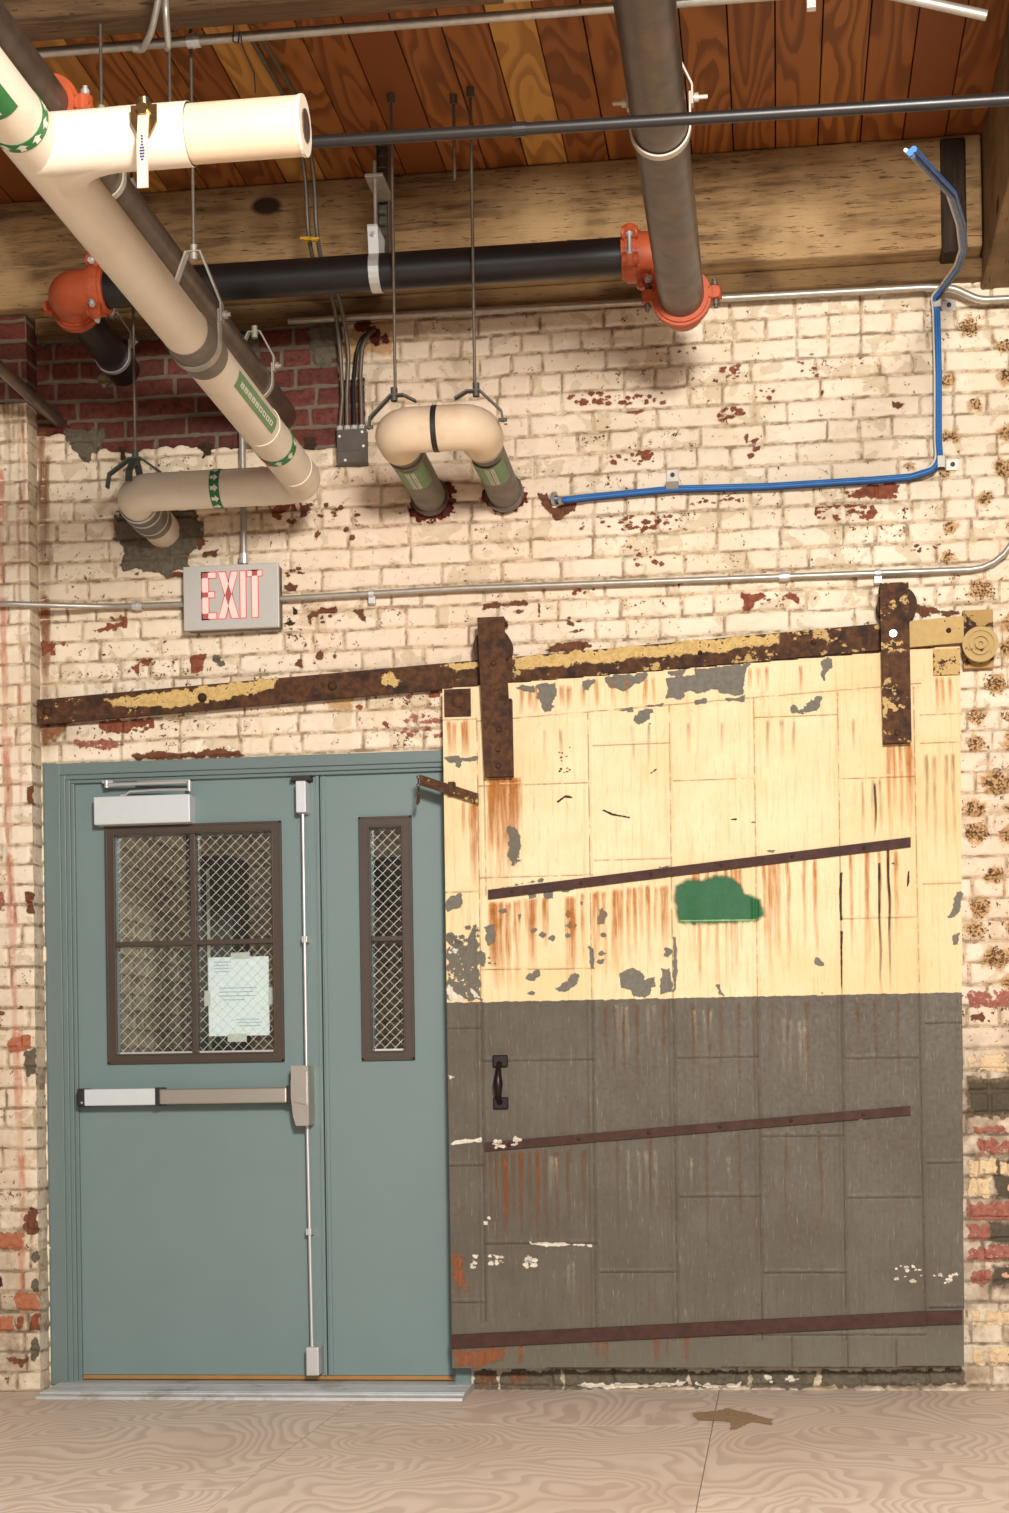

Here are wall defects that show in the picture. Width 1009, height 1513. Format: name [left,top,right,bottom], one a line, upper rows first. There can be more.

peeling [537,493,679,533]
corrosion [970,580,995,602]
peeling [582,662,751,725]
spalling [74,717,244,761]
corrosion [887,745,912,775]
corrosion [471,779,517,840]
corrosion [490,899,546,951]
peeling [445,878,608,1002]
corrosion [570,887,664,936]
peeling [619,937,678,998]
water stain [575,1380,741,1390]
water stain [693,1408,773,1430]